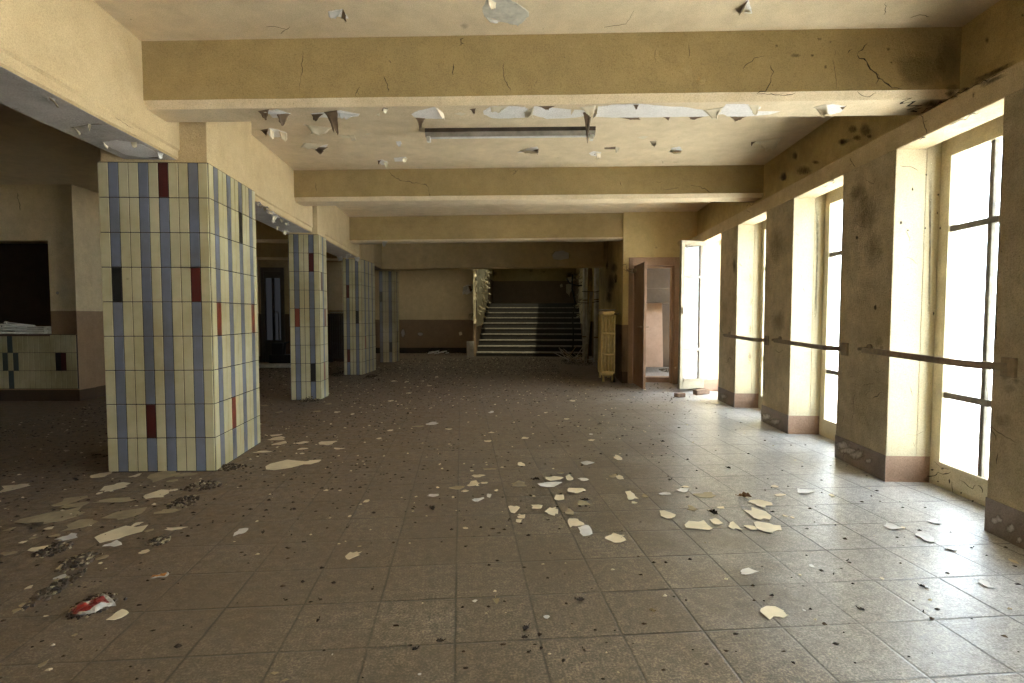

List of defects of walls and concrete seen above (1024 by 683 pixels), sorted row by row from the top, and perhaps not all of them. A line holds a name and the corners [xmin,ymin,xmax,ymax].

peeling [482,0,529,26]
peeling [258,109,290,142]
peeling [300,110,360,155]
peeling [412,104,782,160]
crack [743,56,792,96]
peeling [814,104,846,119]
crack [833,45,1004,140]
peeling [255,202,289,235]